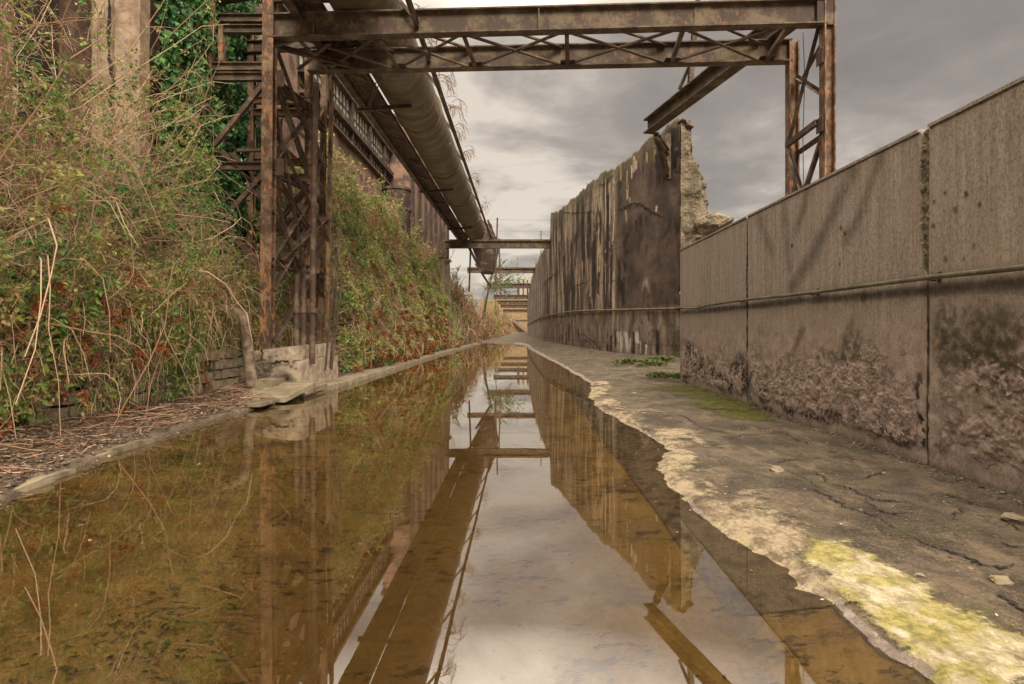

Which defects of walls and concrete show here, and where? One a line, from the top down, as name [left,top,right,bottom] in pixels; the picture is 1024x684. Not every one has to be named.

leakage [555,128,680,352]
leakage [672,331,860,428]
leakage [588,374,1024,684]
crack [672,395,1024,610]